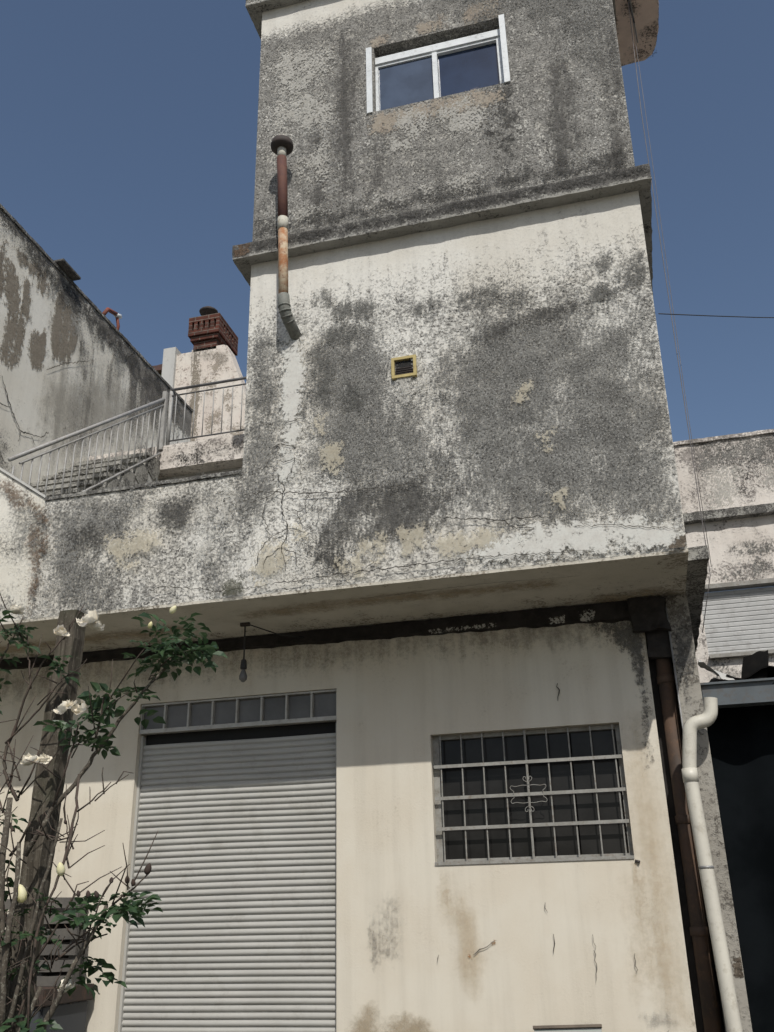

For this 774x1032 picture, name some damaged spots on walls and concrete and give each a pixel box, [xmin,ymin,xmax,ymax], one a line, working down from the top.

damp [252,0,657,251]
peeling [0,240,85,371]
crack [0,377,49,467]
damp [0,250,683,618]
crack [142,417,677,593]
damp [695,435,774,496]
damp [718,541,774,582]